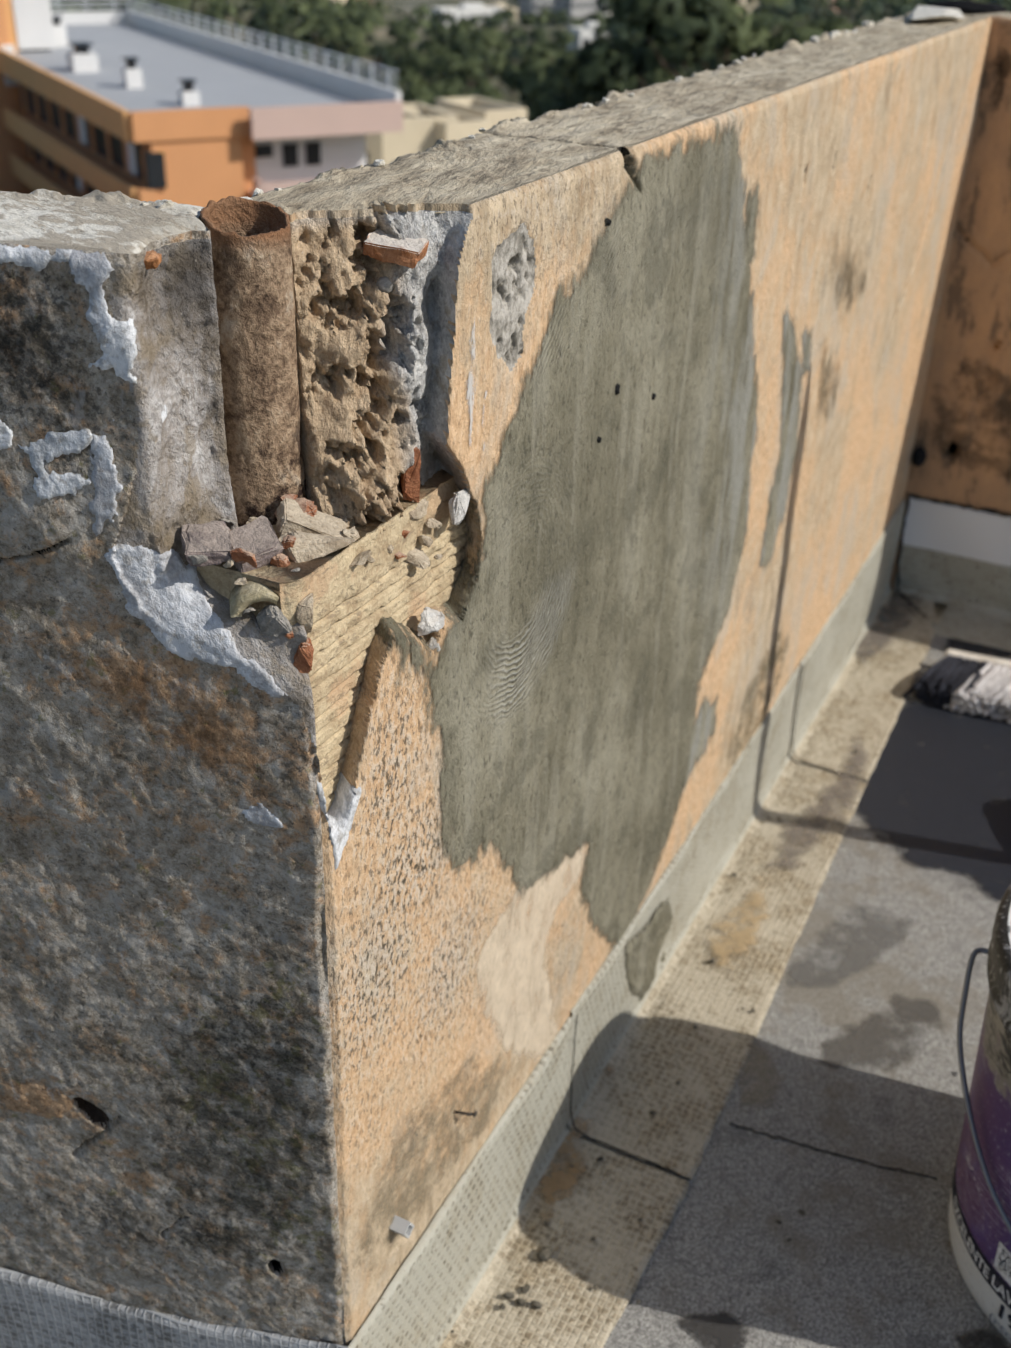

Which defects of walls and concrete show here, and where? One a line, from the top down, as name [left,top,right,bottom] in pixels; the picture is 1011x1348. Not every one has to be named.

crack [621,147,630,167]
spalling [490,222,536,372]
spalling [290,210,482,576]
spalling [0,238,316,748]
spalling [341,605,453,787]
peeling [242,802,284,828]
flaking render [1,1081,109,1127]